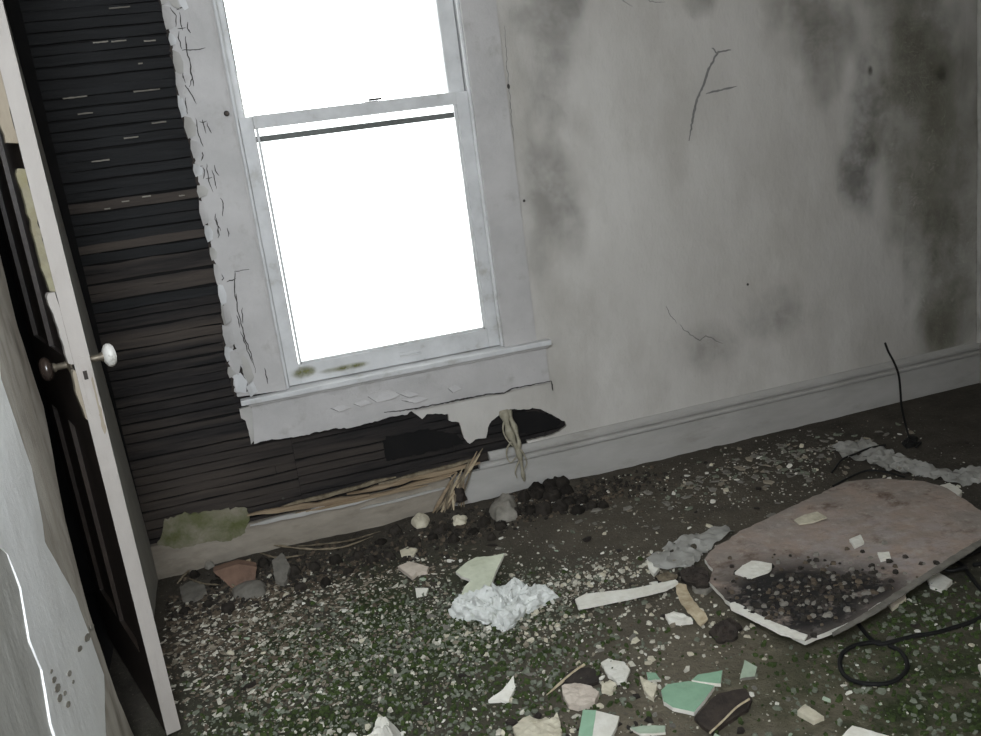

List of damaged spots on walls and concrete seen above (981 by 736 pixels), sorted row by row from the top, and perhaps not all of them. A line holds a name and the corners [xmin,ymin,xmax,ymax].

crack [689,48,737,141]
flaking render [19,0,565,545]
crack [384,381,553,413]